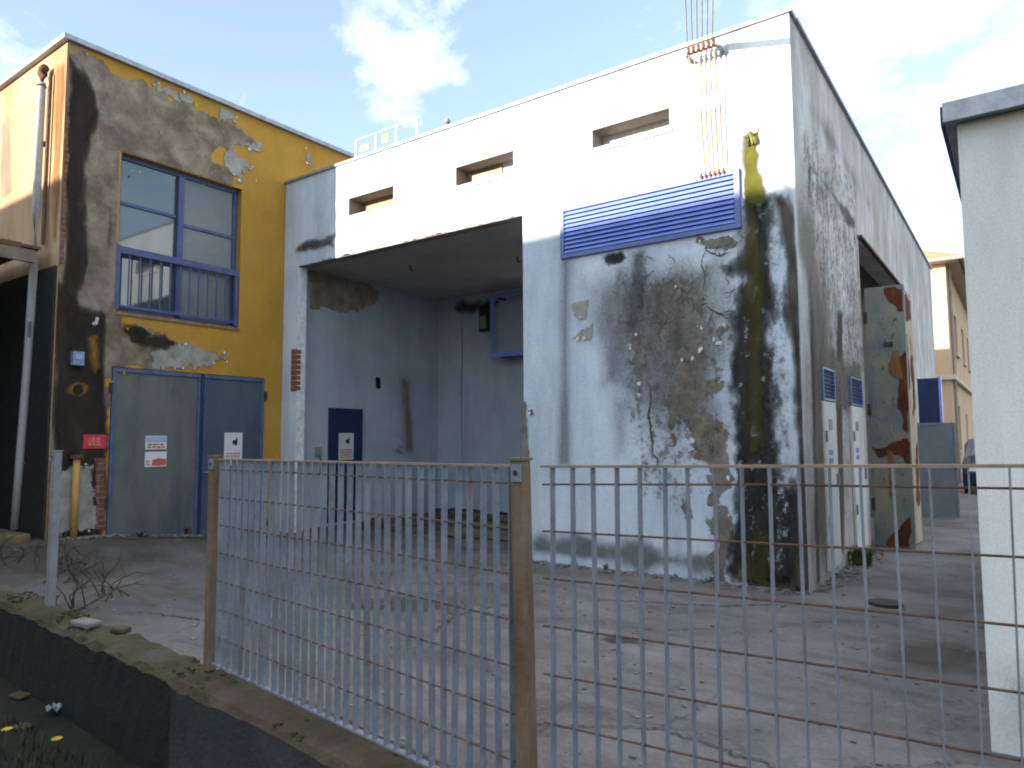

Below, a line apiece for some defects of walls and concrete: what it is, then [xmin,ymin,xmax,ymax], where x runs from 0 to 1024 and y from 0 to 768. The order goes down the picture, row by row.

leakage [806,156,855,235]
leakage [52,58,107,516]
peeling [47,51,263,537]
leakage [296,235,335,251]
peeling [308,253,380,313]
peeling [571,299,593,340]
peeling [696,233,738,250]
crack [647,384,658,465]
peeling [615,273,753,584]
leakage [609,195,862,592]
rust [872,287,920,507]
leakage [46,528,102,540]